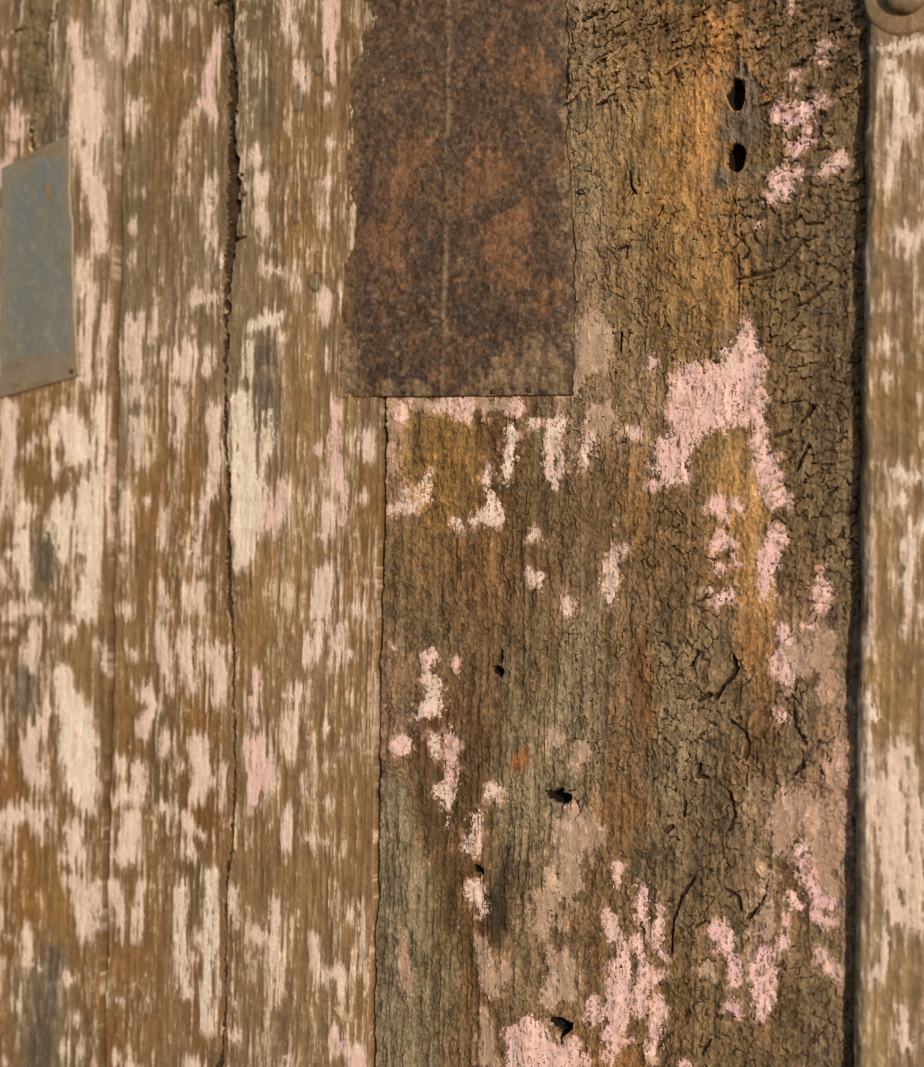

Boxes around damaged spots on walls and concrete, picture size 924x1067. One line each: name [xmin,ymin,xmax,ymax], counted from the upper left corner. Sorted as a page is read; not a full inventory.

peeling [321,0,340,107]
peeling [0,0,217,676]
peeling [134,310,291,758]
crack [213,0,247,1067]
corrosion [337,0,575,542]
peeling [302,308,795,676]
peeling [0,663,282,1036]
peeling [242,667,307,813]
peeling [308,897,365,999]
peeling [387,644,506,920]
peeling [473,788,672,1067]
peeling [698,563,924,1025]